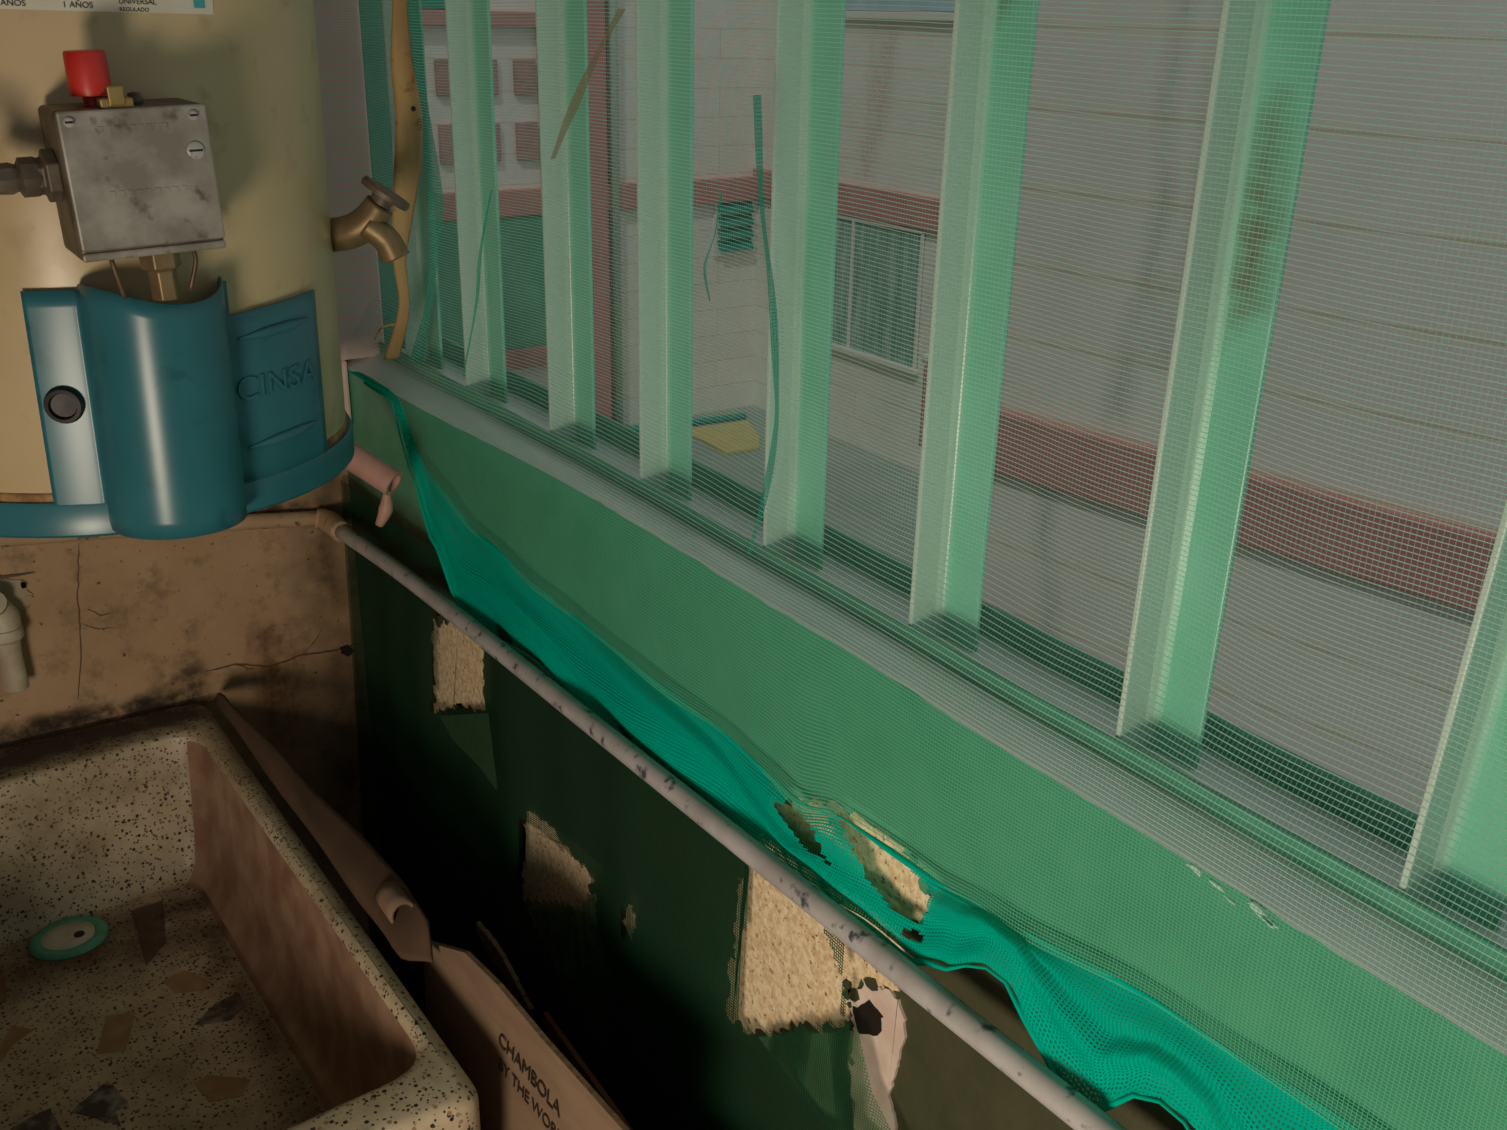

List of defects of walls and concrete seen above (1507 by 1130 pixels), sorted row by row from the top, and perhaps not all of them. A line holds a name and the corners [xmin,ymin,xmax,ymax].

flaking render [431,614,485,714]
flaking render [521,811,599,978]
flaking render [754,796,934,952]
flaking render [726,863,907,1130]